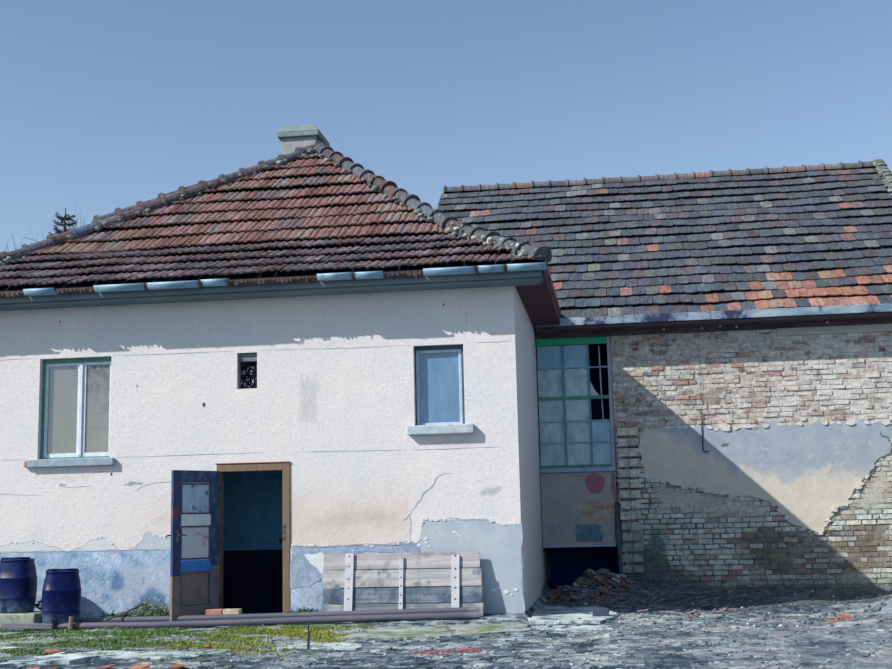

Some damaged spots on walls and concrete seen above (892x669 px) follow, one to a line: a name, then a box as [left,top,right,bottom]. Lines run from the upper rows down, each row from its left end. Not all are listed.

peeling [0,531,171,552]
crack [143,450,263,458]
crack [305,473,449,547]
peeling [290,518,525,614]
peeling [638,420,892,535]